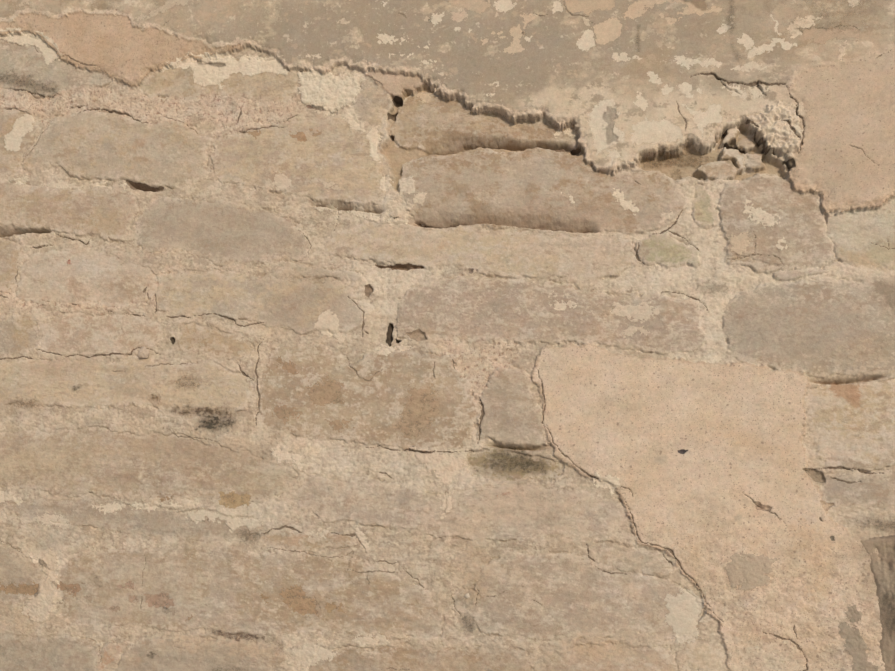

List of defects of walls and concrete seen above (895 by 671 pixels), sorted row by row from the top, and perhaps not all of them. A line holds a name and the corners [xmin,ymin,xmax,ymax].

spalling [0,28,76,66]
peeling [424,0,537,54]
peeling [552,0,732,62]
peeling [673,14,861,72]
peeling [4,114,35,152]
peeling [273,33,748,170]
peeling [722,83,770,99]
crack [690,73,805,155]
crack [0,347,186,372]
crack [111,287,264,425]
crack [538,370,598,479]
crack [623,487,722,621]